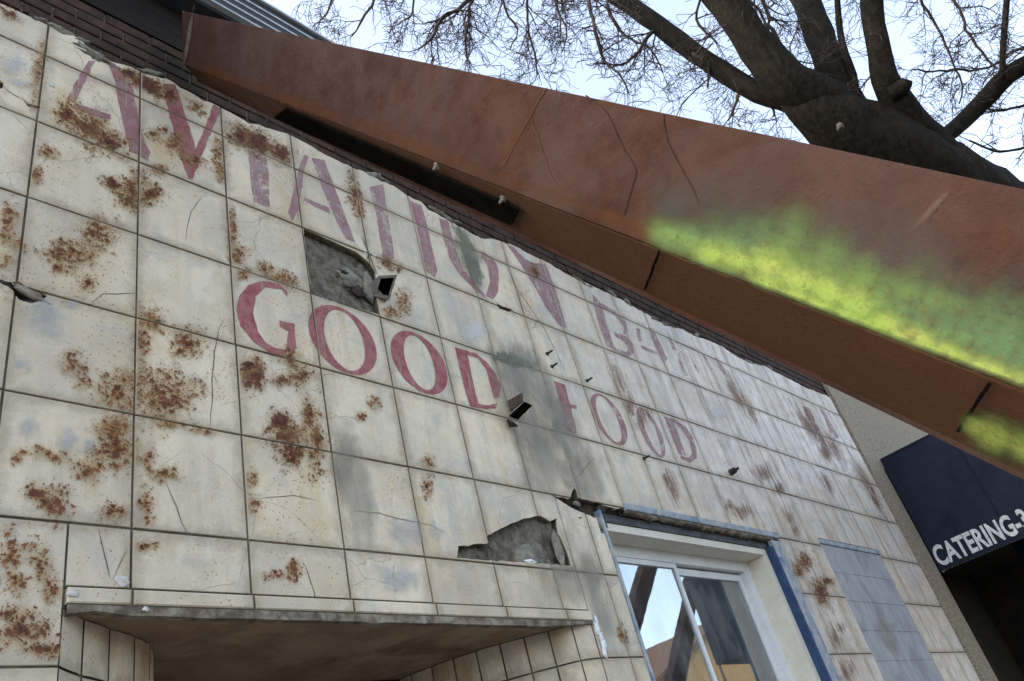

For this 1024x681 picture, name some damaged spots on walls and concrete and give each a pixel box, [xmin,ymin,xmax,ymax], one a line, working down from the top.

rust [0,37,301,296]
spalling [0,280,52,305]
peeling [304,234,377,313]
rust [231,343,329,487]
rust [0,300,226,661]
peeling [113,576,130,588]
rust [263,557,307,583]
spalling [457,518,567,566]
rust [782,510,843,648]